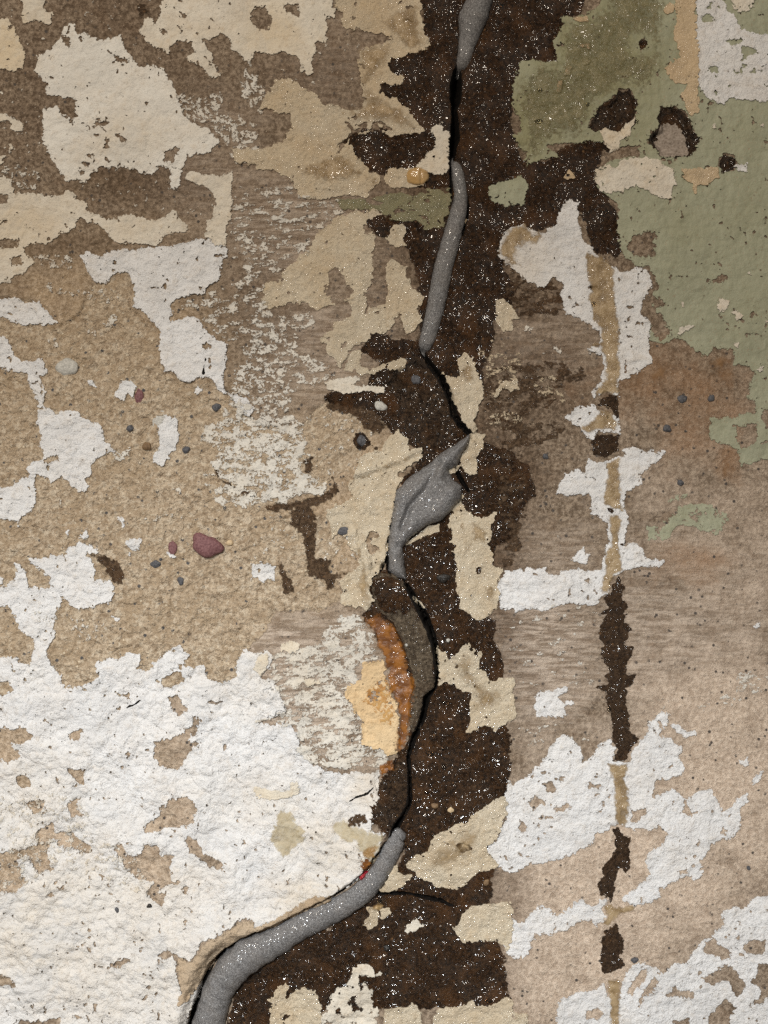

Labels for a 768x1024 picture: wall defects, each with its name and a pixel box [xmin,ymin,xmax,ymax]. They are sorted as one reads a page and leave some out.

crack [449,66,470,236]
peeling [488,0,768,467]
crack [420,351,472,435]
peeling [0,0,532,1024]
crack [455,469,470,492]
rust [379,760,393,775]
rust [363,614,414,749]
crack [334,518,454,907]
peeling [379,643,768,906]
crack [188,938,243,1024]
peeling [452,899,607,959]
peeling [555,896,768,1024]